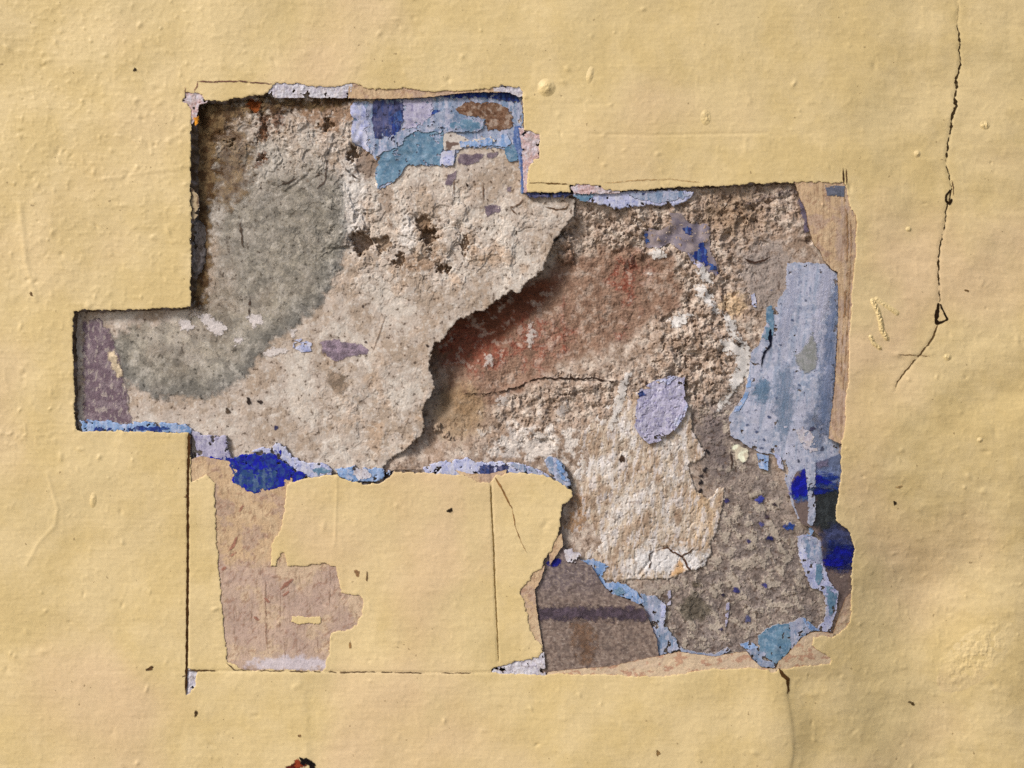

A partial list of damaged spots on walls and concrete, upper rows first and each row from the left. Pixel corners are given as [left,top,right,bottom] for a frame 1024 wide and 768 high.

crack [895,25,961,387]
spalling [72,83,857,677]
crack [465,376,618,395]
crack [490,478,525,659]
crack [642,547,703,577]
crack [779,668,790,694]